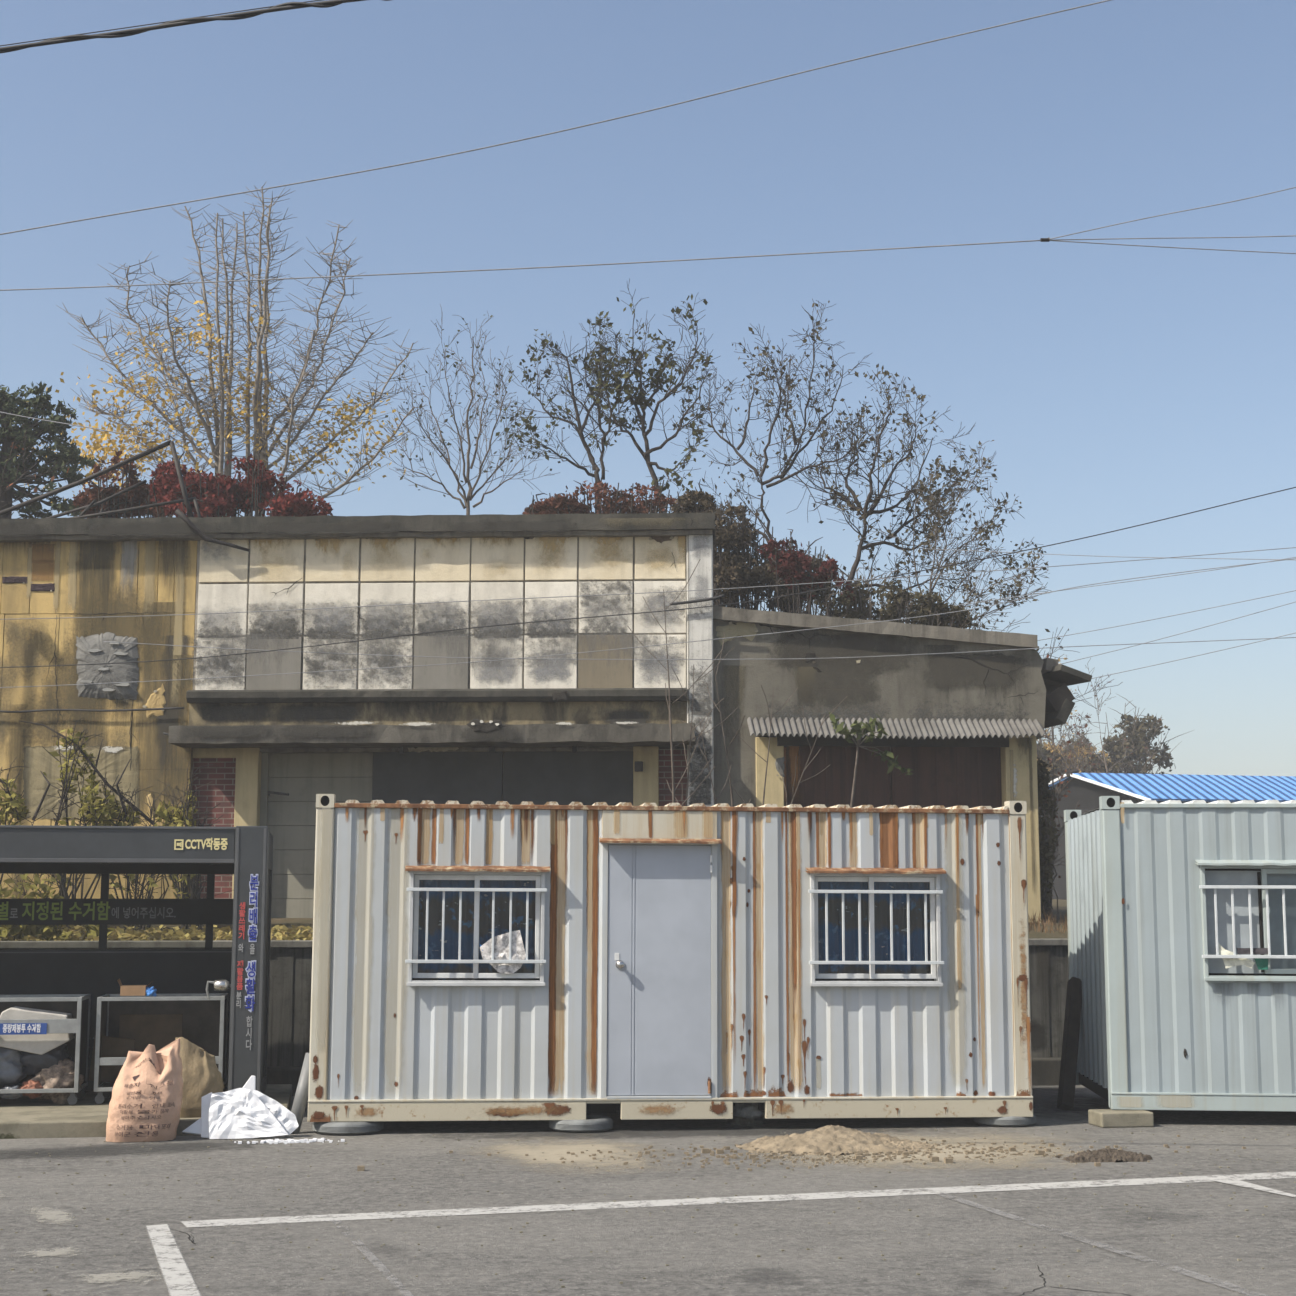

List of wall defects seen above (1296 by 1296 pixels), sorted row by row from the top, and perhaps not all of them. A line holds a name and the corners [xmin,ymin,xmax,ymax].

leakage [0,518,745,811]
leakage [765,627,911,721]
leakage [913,645,1028,721]
rust [346,808,493,864]
rust [675,811,687,838]
leakage [1019,738,1035,883]
rust [487,809,571,1118]
rust [704,746,928,1116]
rust [645,1106,675,1114]